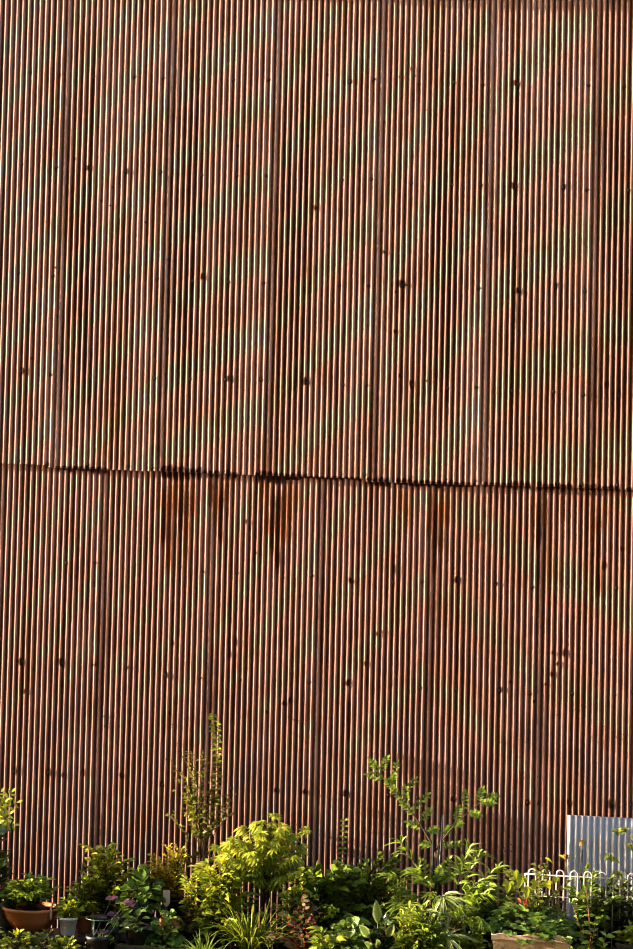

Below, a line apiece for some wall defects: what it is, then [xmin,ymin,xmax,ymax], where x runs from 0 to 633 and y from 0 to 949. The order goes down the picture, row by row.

corrosion [45,464,108,474]
corrosion [157,464,237,617]
corrosion [159,600,190,740]